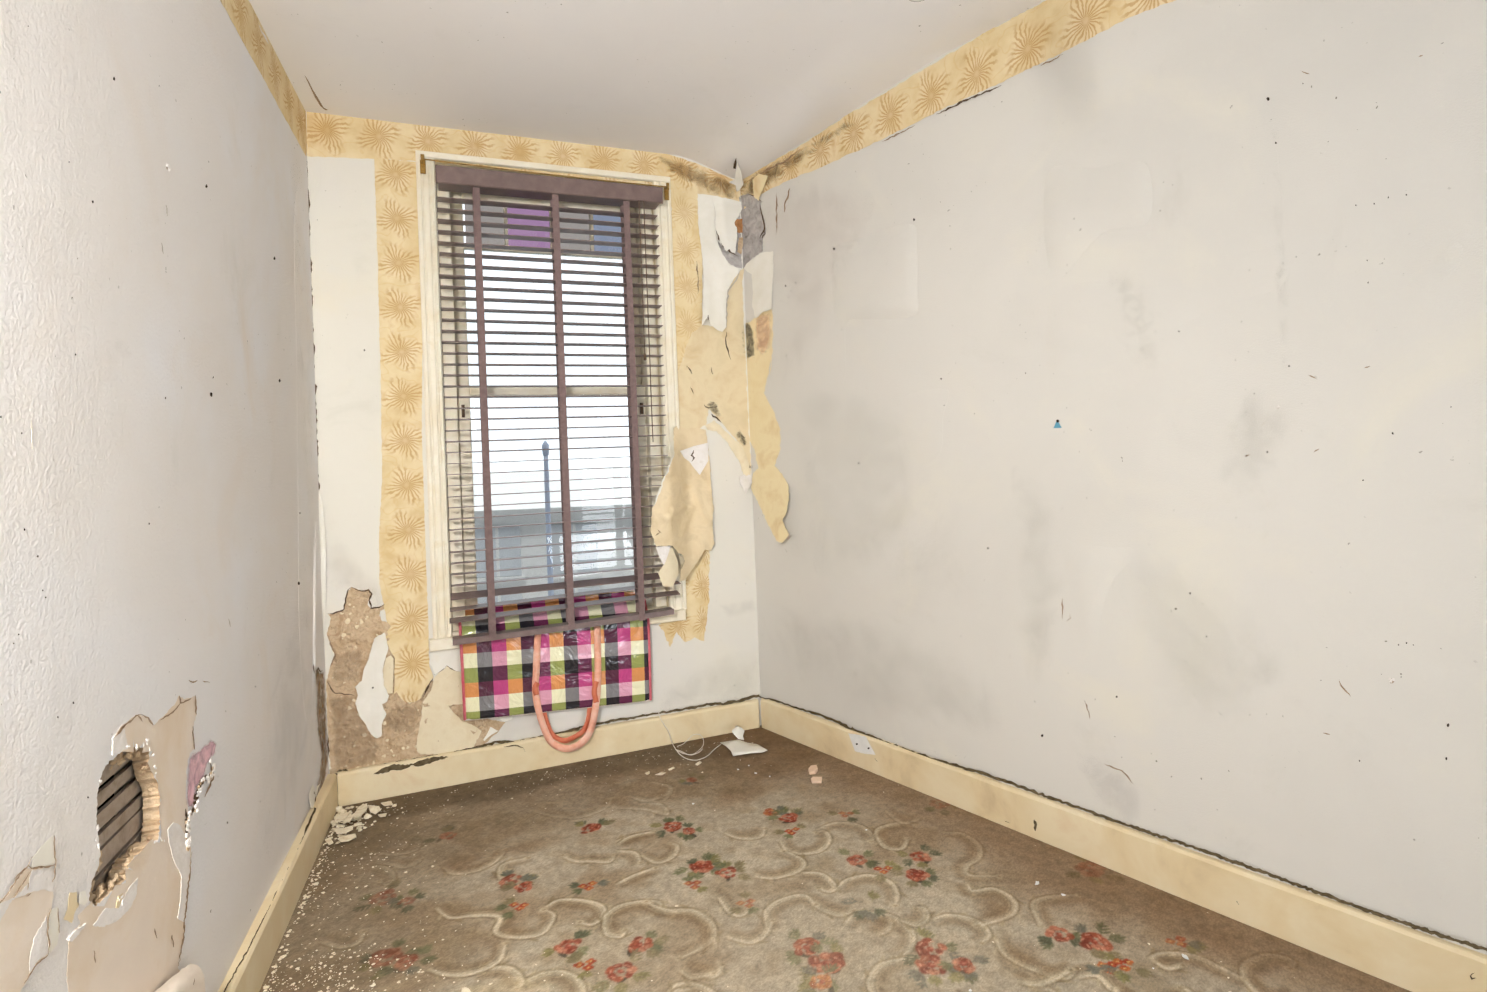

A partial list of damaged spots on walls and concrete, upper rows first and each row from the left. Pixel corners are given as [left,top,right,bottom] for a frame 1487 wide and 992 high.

flaking render [678,268,789,543]
spalling [309,587,512,808]
flaking render [0,696,206,992]